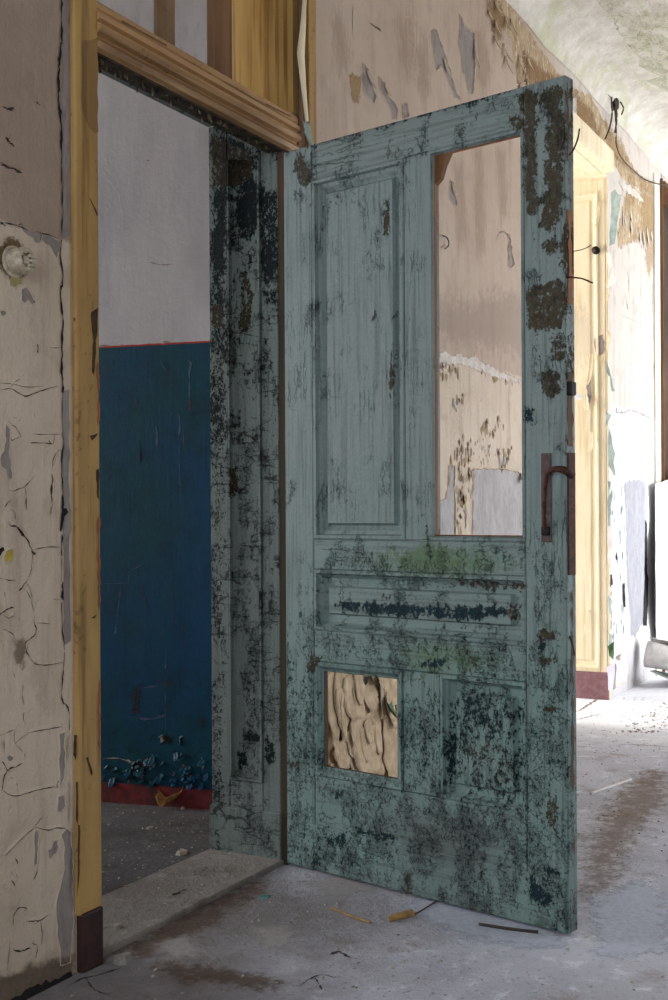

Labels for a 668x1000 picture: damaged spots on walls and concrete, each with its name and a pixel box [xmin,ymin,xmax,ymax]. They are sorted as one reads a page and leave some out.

peeling [360,63,410,121]
peeling [431,14,481,102]
water stain [487,2,506,40]
flaking render [488,0,563,87]
water stain [523,51,554,83]
water stain [576,96,599,136]
flaking render [573,86,653,250]
crack [0,0,70,796]
peeling [0,422,14,481]
flaking render [11,680,209,1000]
crack [7,907,49,970]